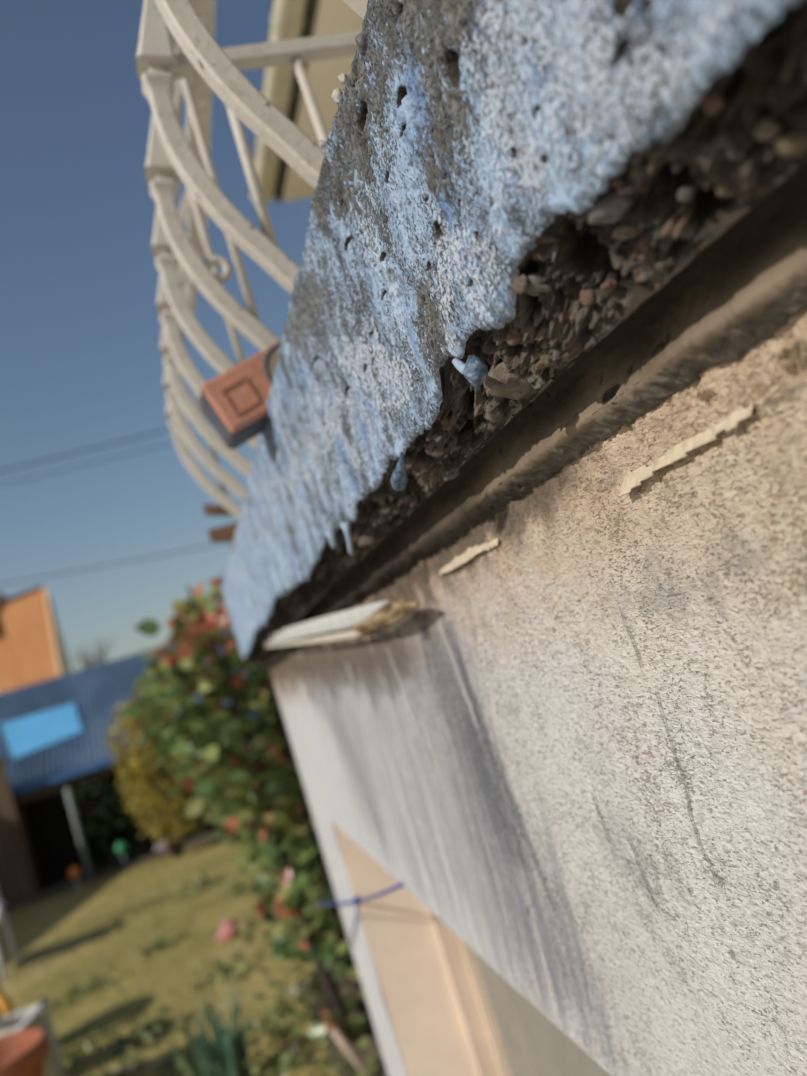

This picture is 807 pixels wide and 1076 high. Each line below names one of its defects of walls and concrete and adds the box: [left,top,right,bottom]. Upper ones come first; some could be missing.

spalling [245,0,807,662]
water stain [372,469,567,607]
water stain [269,630,409,693]